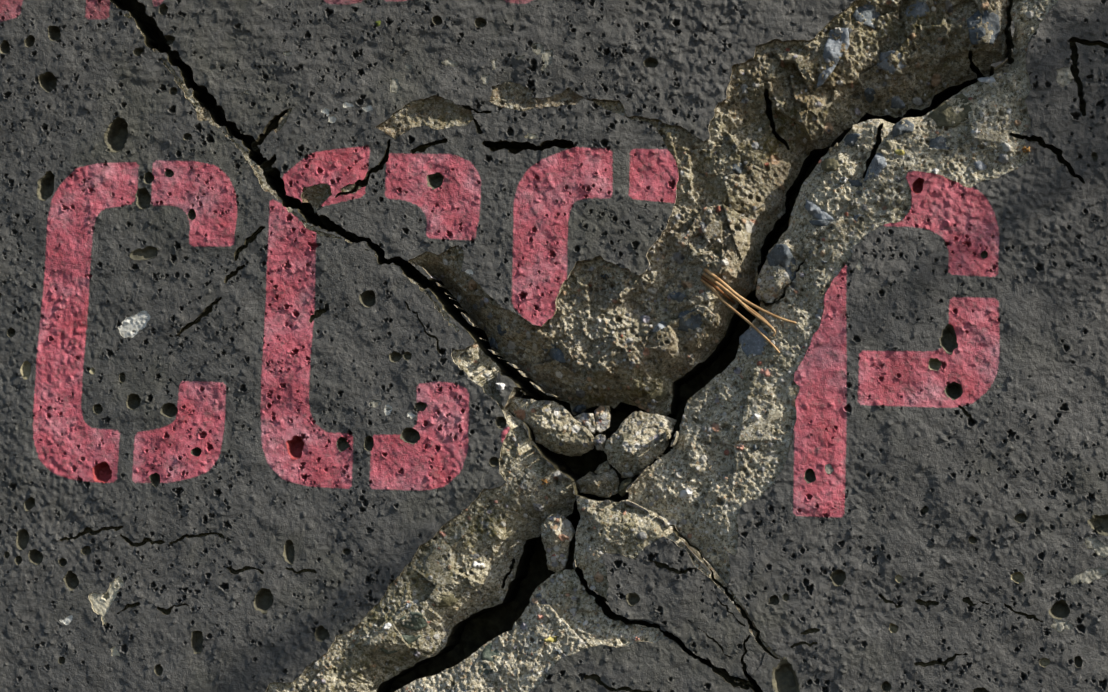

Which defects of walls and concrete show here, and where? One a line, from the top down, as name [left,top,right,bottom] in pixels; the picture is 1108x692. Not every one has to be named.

crack [1004,0,1014,64]
crack [1069,37,1108,116]
crack [1009,133,1085,184]
crack [110,0,994,692]
spalling [265,0,1059,692]
crack [60,526,225,547]
crack [878,594,1044,623]